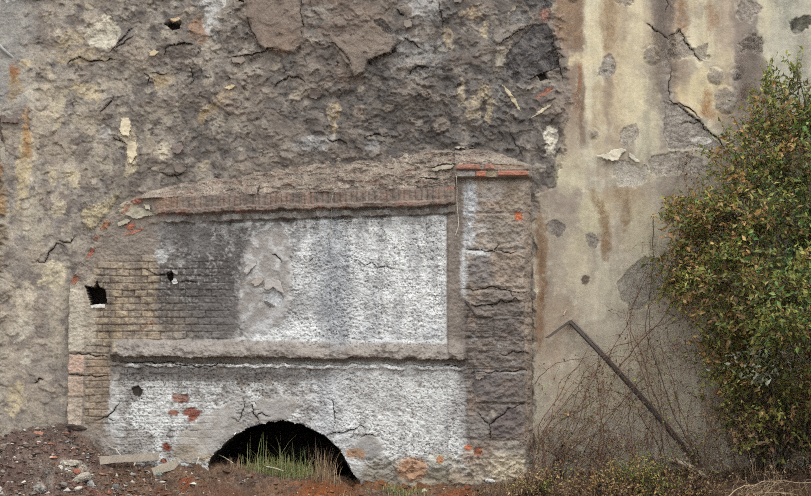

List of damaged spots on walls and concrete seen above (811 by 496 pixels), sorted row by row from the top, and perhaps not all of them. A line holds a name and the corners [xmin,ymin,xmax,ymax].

flaking render [790,15,811,34]
spalling [598,54,616,77]
spalling [531,87,554,118]
crack [668,68,725,149]
peeling [118,117,138,177]
spalling [597,101,720,186]
spalling [87,198,150,258]
spalling [546,220,565,237]
leakage [596,204,610,253]
spalling [244,259,284,307]
spalling [617,256,664,311]
spalling [169,394,201,421]